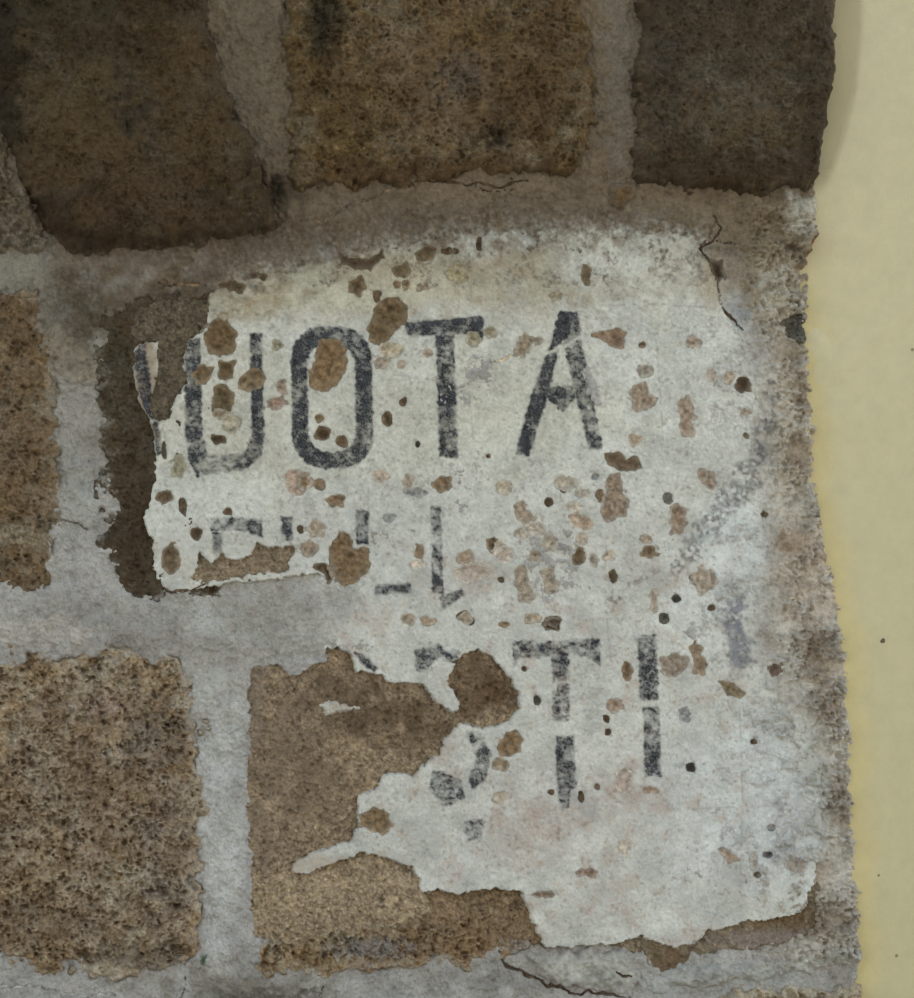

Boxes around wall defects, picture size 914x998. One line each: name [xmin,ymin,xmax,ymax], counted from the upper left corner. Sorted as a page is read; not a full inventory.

spalling [213,279,246,294]
crack [699,215,743,330]
spalling [129,297,288,445]
spalling [308,338,348,392]
spalling [313,423,348,448]
peeling [169,453,187,479]
spalling [155,490,174,505]
peeling [283,469,345,508]
spalling [161,541,181,575]
spalling [190,519,371,587]
spalling [245,647,555,949]
crack [502,959,632,998]